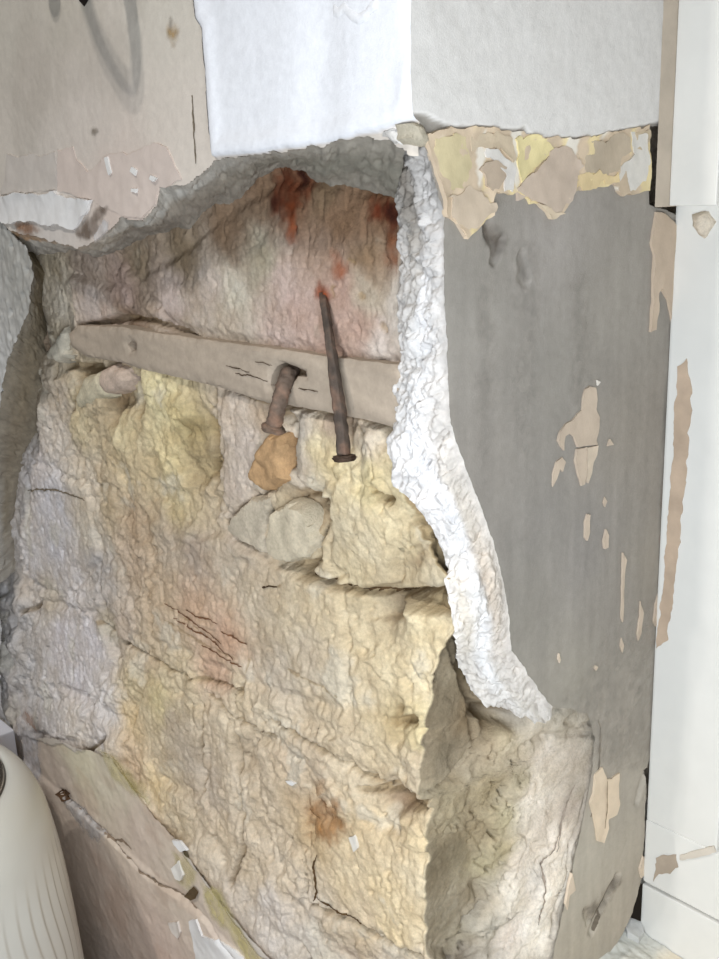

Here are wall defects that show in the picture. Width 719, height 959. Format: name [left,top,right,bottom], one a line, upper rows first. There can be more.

corrosion [271,170,312,233]
peeling [425,124,676,239]
peeling [649,212,677,332]
peeling [552,380,614,487]
spalling [0,136,595,959]
peeling [636,594,658,641]
peeling [589,767,620,843]
spalling [625,918,644,943]